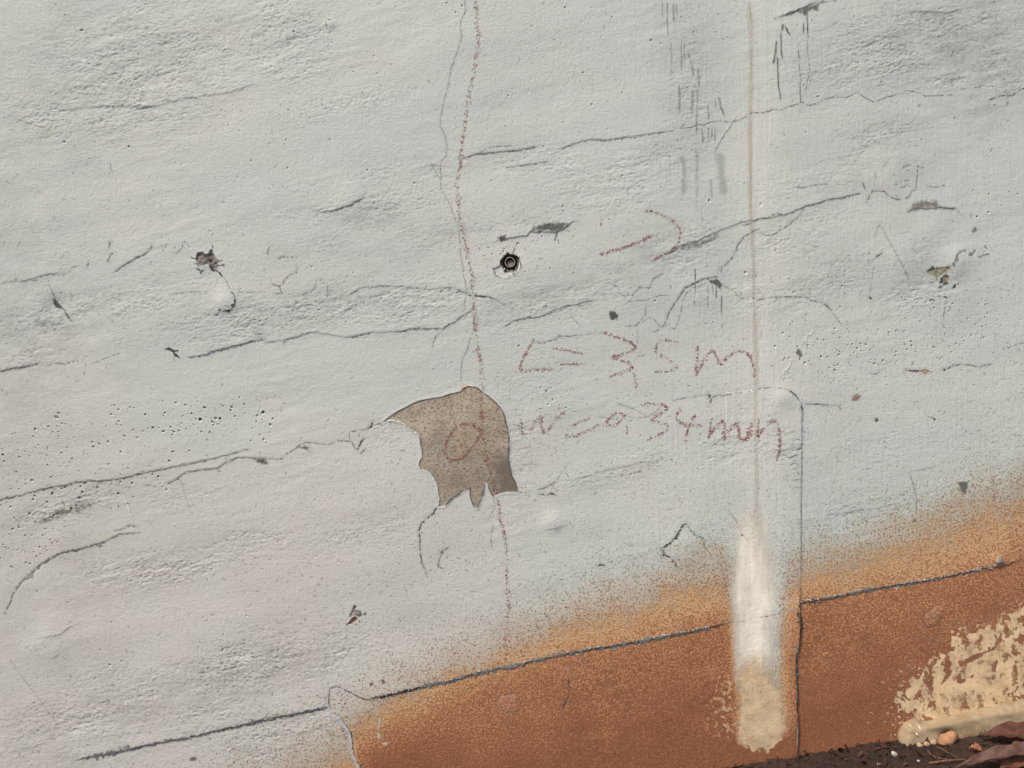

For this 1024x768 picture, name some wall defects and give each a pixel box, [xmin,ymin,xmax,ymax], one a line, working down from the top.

crack [396,0,1024,374]
crack [187,332,309,358]
crack [0,422,381,500]
peeling [379,381,521,511]
crack [4,525,140,614]
crack [87,387,1023,768]
water stain [722,522,786,753]
peeling [887,600,1024,735]